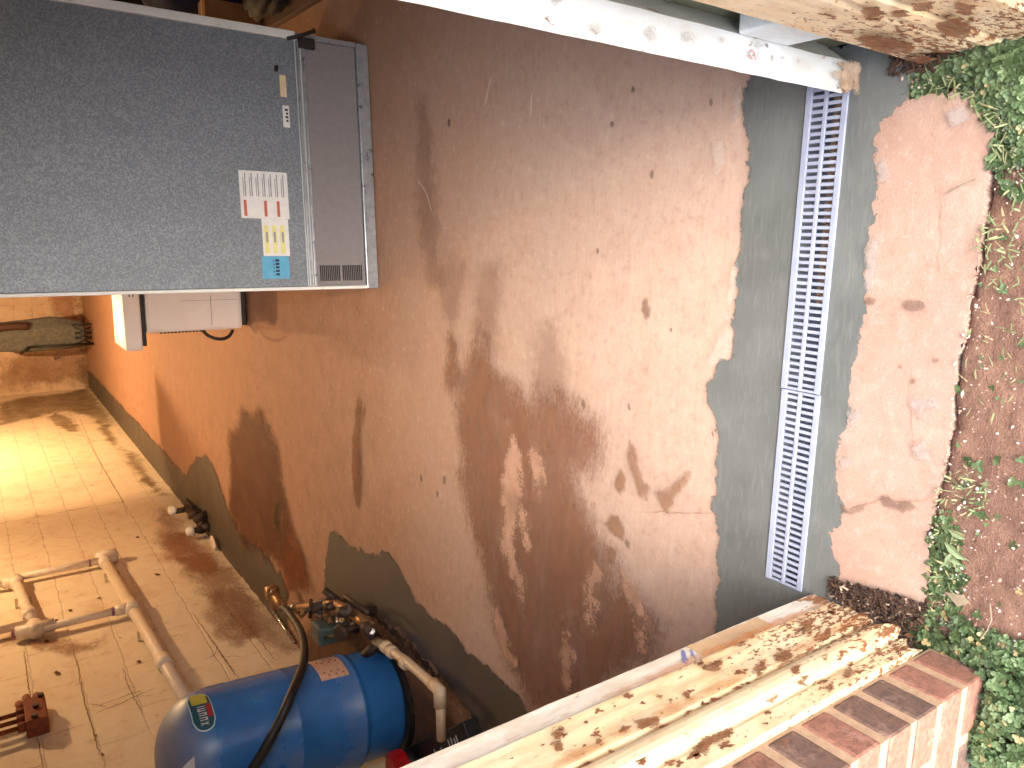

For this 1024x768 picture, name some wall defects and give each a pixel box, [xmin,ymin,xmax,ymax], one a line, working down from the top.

water stain [228,411,306,589]
water stain [352,399,365,506]
water stain [445,333,662,711]
water stain [615,445,689,511]